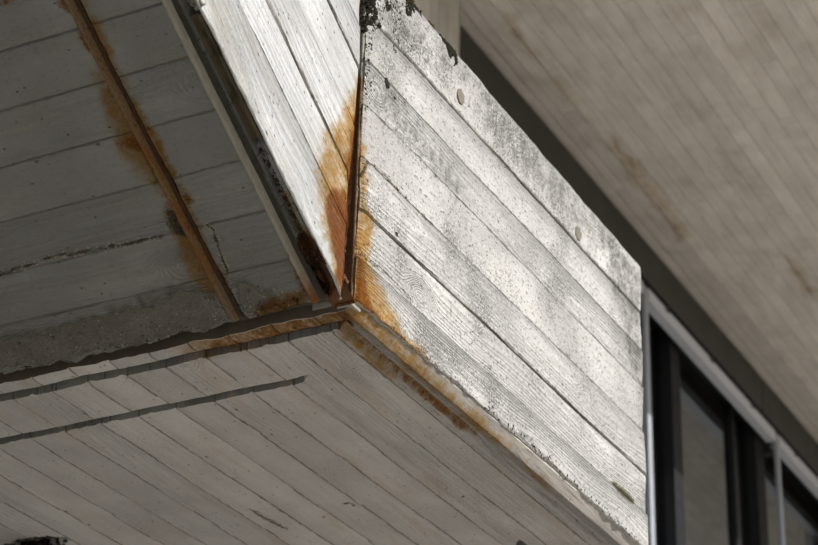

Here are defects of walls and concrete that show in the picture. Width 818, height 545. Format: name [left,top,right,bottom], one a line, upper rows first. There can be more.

spalling [259,147,355,308]
corrosion [328,77,370,308]
spalling [0,286,230,374]